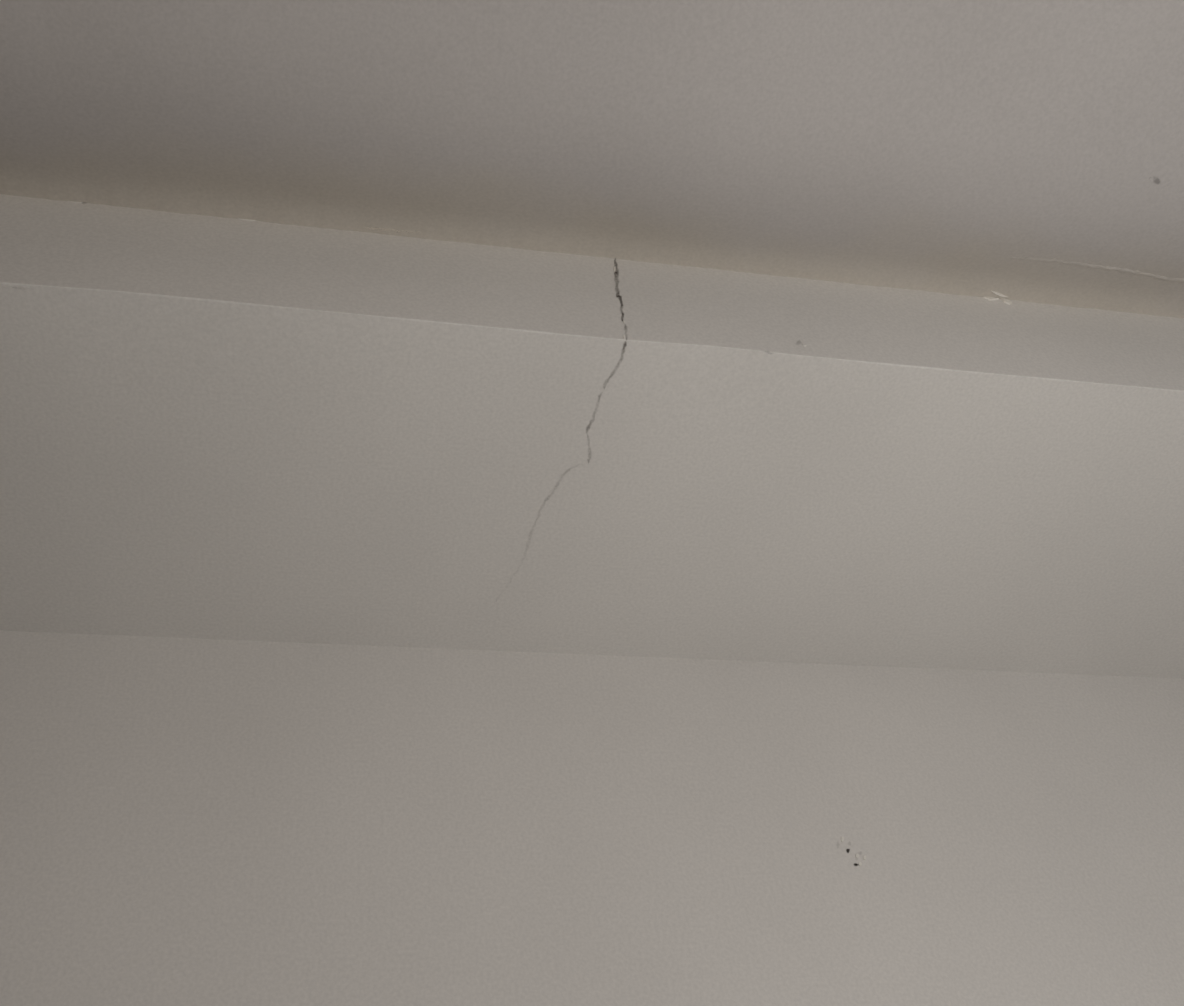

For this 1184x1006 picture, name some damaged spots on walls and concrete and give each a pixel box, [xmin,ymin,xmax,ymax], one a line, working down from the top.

crack [614,264,626,349]